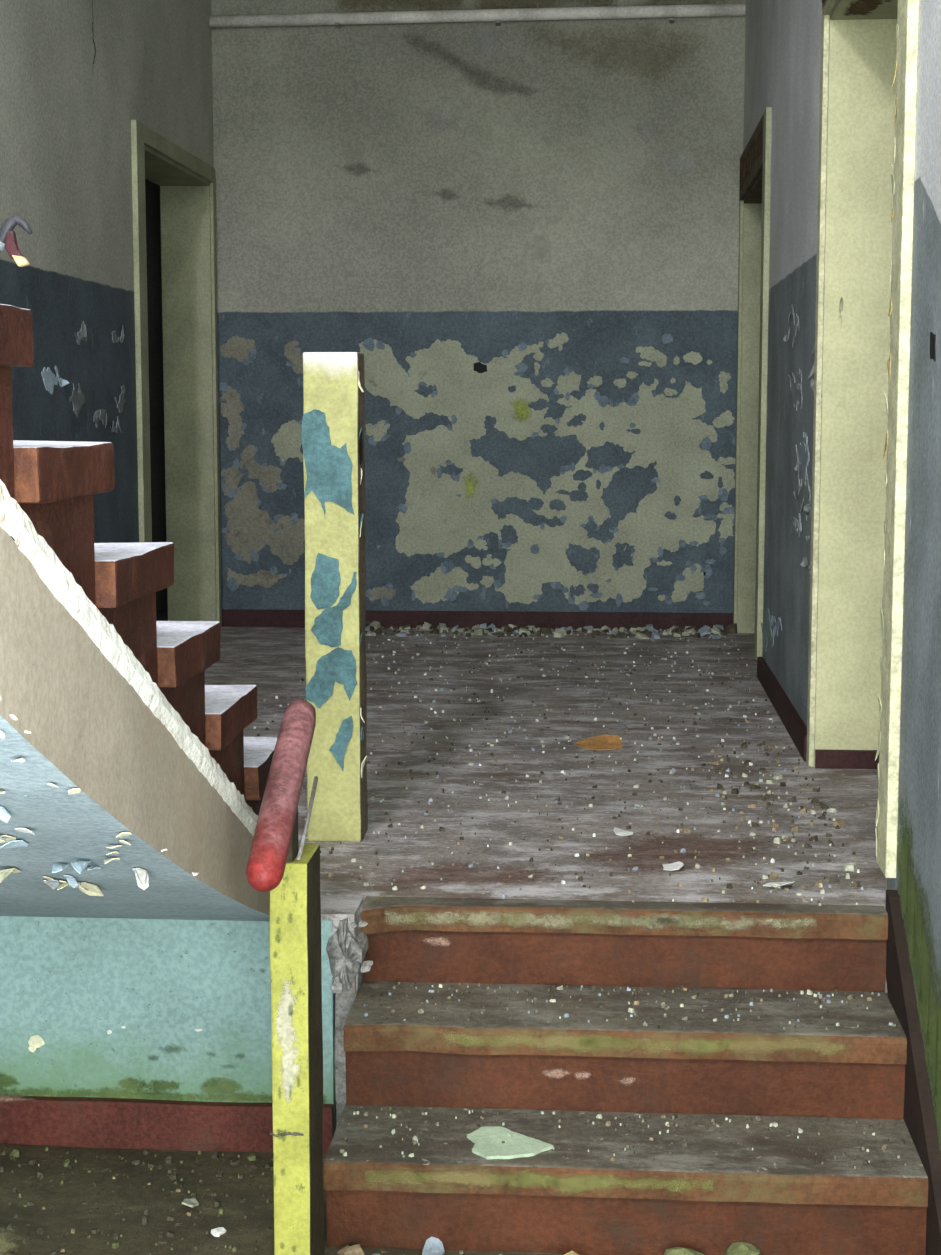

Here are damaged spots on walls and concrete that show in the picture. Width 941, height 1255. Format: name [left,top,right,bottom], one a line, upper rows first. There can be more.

water stain [481,0,613,9]
peeling [220,336,256,365]
peeling [284,341,304,374]
peeling [41,365,125,433]
peeling [358,332,736,610]
peeling [219,382,305,592]
water stain [494,914,534,926]
water stain [627,916,718,928]
spalling [326,918,373,993]
water stain [680,1040,718,1051]
water stain [0,1074,272,1102]
water stain [433,1172,503,1186]